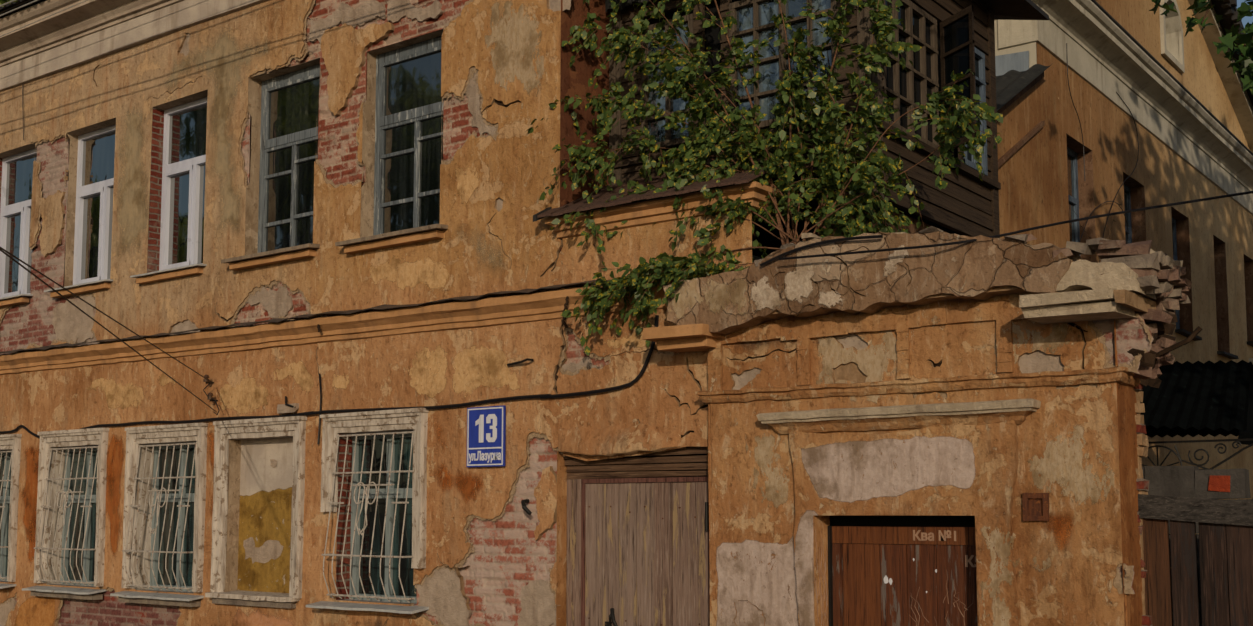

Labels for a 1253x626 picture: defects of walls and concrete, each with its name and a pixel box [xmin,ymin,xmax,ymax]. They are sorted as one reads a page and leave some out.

spalling [250,0,473,188]
peeling [440,0,571,204]
spalling [0,135,103,355]
spalling [230,280,312,327]
spalling [780,233,822,249]
crack [769,245,871,316]
crack [611,348,708,438]
flaking render [730,367,762,390]
crack [727,348,797,361]
peeling [816,330,898,403]
spalling [410,432,567,626]
spalling [54,587,182,626]